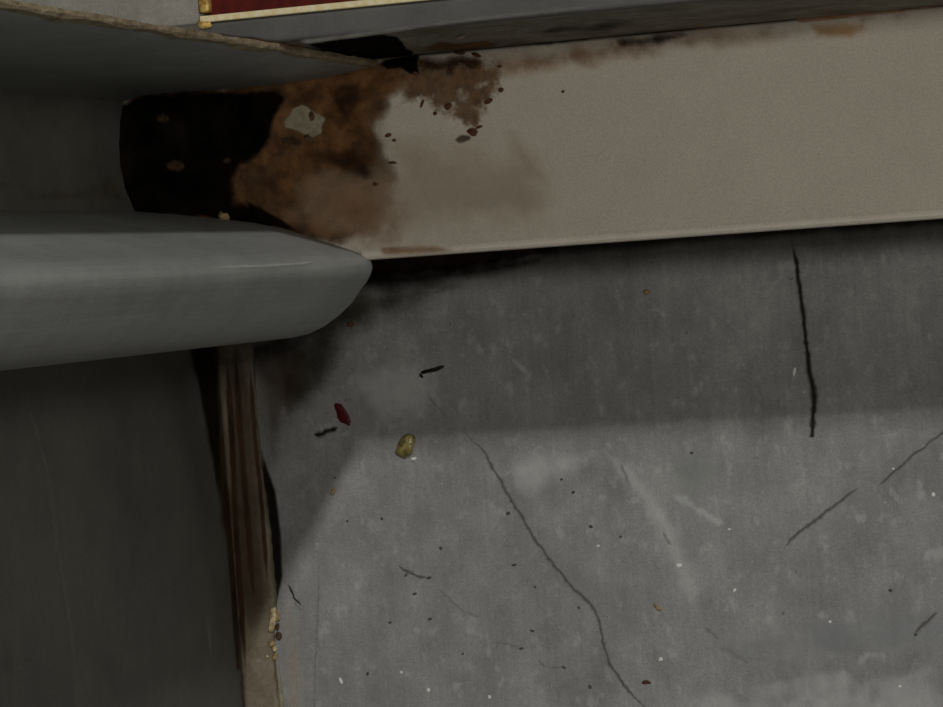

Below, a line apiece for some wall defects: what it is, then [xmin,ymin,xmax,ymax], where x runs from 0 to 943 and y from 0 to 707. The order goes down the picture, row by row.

rust [797,10,903,36]
spalling [281,105,325,145]
rust [129,34,693,243]
crack [793,249,817,437]
crack [881,431,943,484]
crack [788,488,858,544]
crack [399,566,463,611]
crack [472,441,645,707]